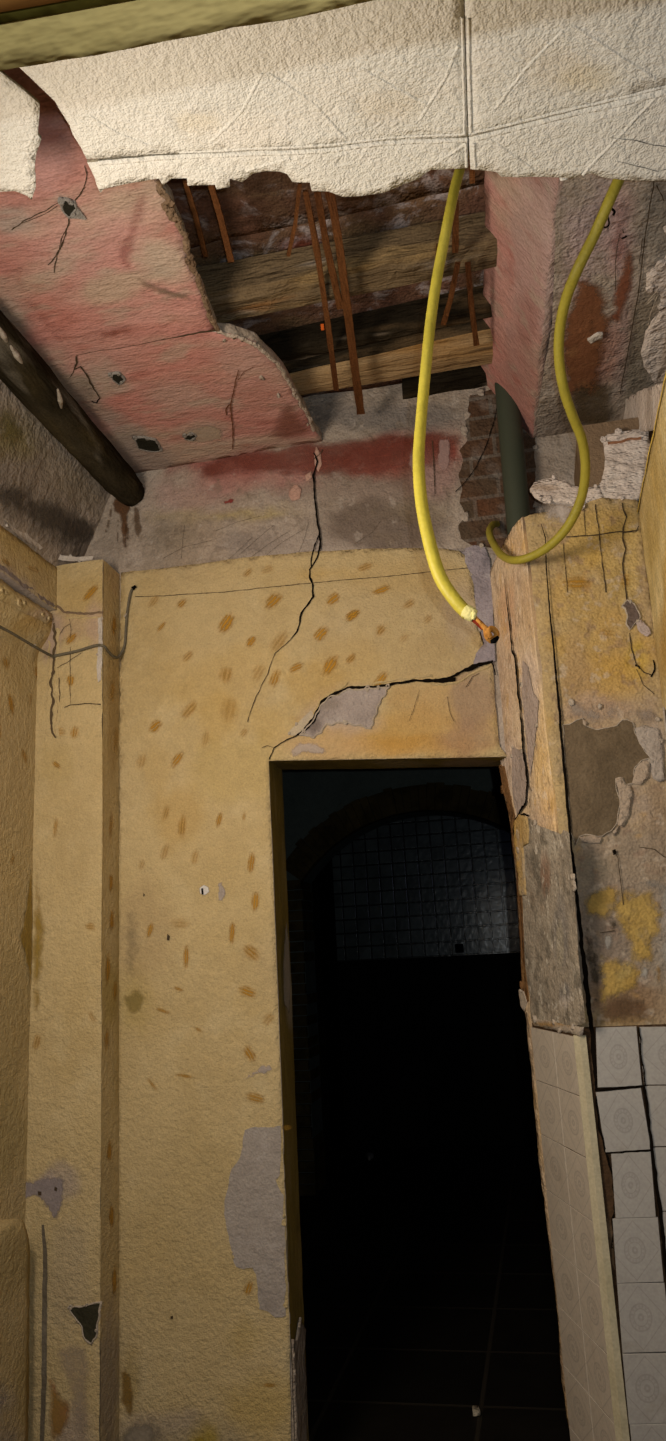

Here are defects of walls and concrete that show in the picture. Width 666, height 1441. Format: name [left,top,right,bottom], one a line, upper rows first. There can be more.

crack [11,166,87,273]
flaking render [155,179,322,501]
water stain [2,490,93,541]
crack [135,449,530,837]
flaking render [499,661,666,1036]
crack [541,503,666,1276]
water stain [122,1372,159,1441]
peeling [224,1126,307,1441]